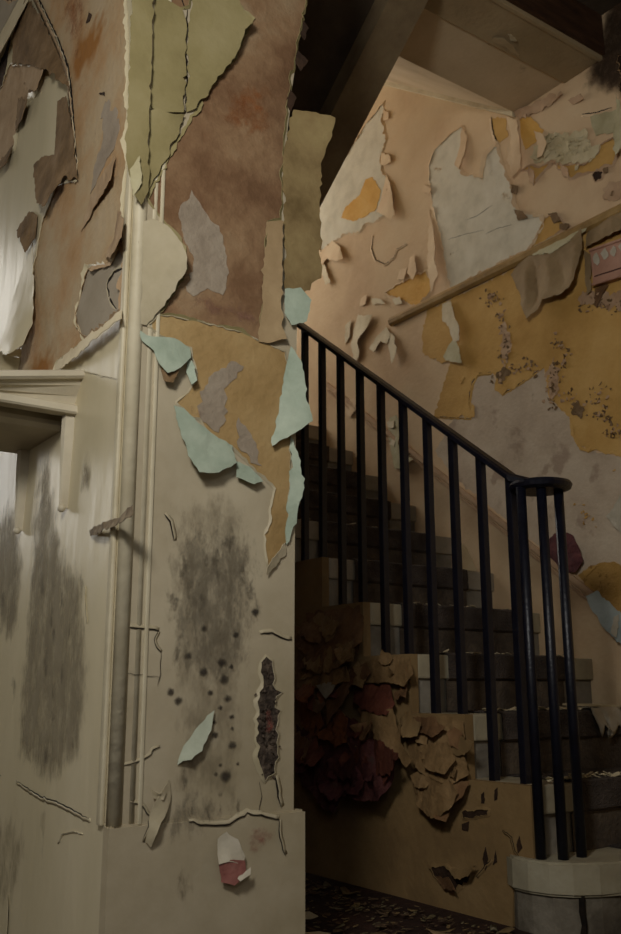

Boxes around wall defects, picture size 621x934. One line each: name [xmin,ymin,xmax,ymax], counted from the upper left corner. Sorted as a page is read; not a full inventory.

flaking render [0,0,395,574]
peeling [345,55,621,644]
damp [0,514,20,635]
damp [22,468,87,773]
flaking render [252,654,283,784]
crack [0,775,91,823]
peeling [217,832,251,886]
crack [187,775,287,855]